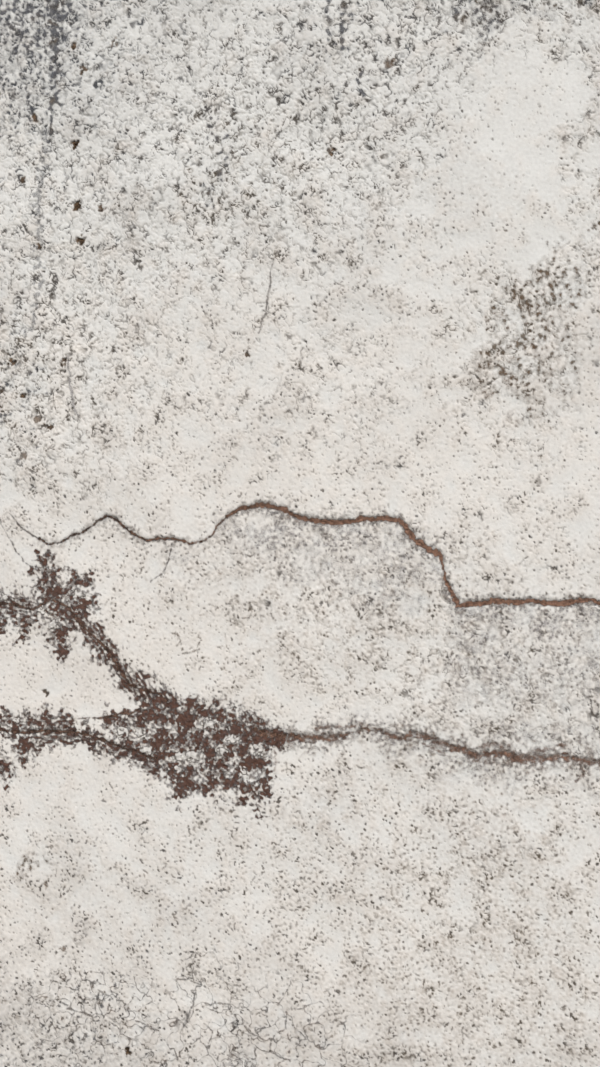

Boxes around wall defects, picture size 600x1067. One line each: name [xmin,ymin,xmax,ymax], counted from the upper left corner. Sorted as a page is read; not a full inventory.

crack [0,500,600,614]
corrosion [0,549,307,819]
crack [252,723,600,782]